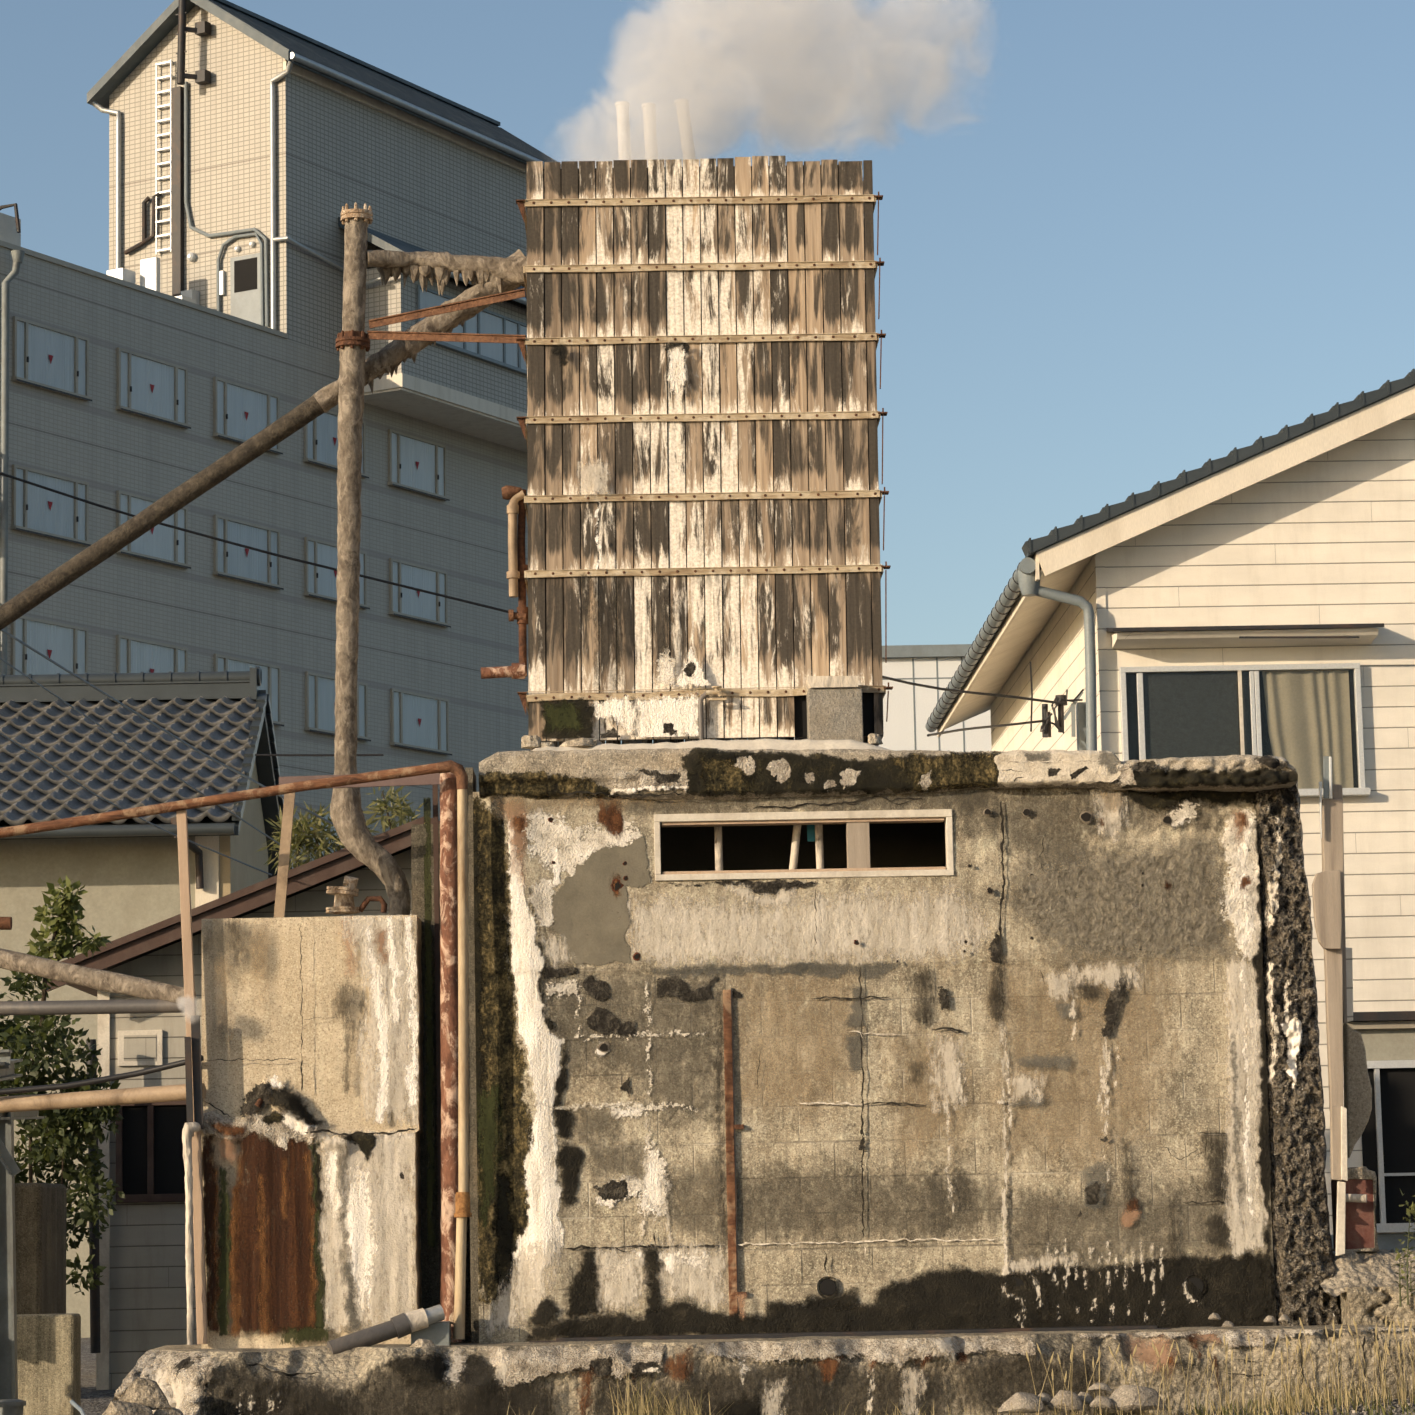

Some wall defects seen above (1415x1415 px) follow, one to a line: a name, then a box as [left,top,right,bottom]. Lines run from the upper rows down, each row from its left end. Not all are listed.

damp [551,344,568,366]
damp [663,342,690,399]
damp [543,505,711,738]
peeling [522,805,643,964]
rust [202,1131,318,1336]
damp [201,915,419,1333]
spalling [545,972,636,1053]
rust [723,988,747,1318]
damp [473,782,1341,1415]
damp [200,1351,556,1415]